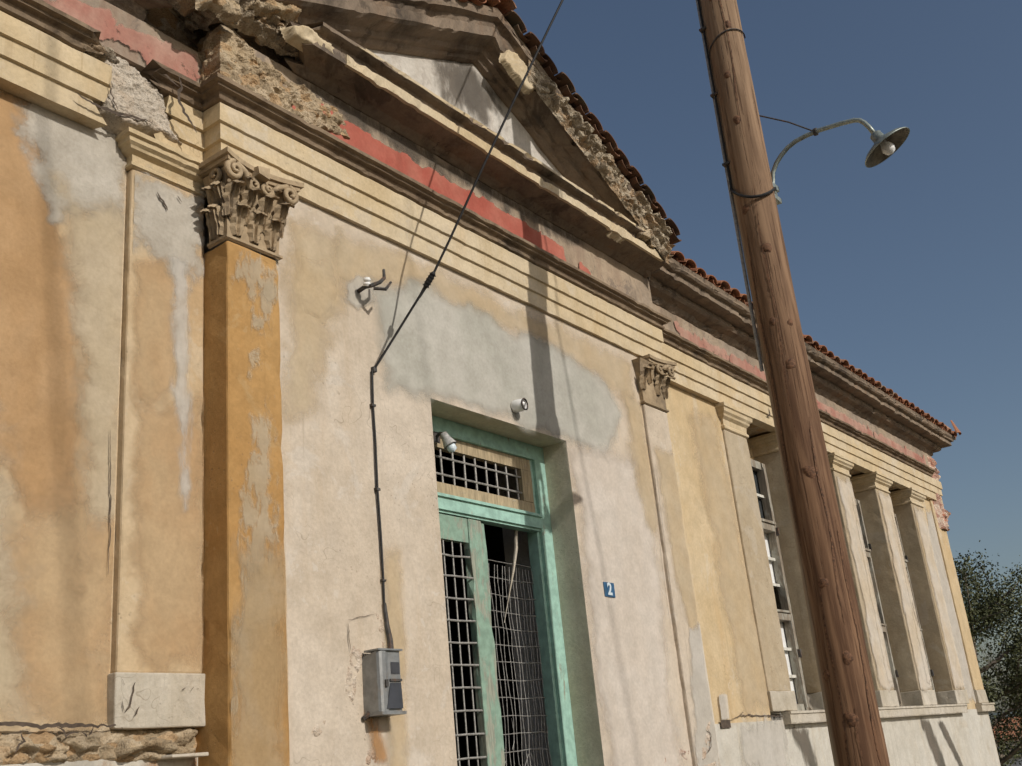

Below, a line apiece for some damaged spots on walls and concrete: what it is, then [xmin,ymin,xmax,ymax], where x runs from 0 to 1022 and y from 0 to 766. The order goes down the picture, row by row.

spalling [44,0,566,261]
spalling [499,50,676,265]
crack [106,435,114,572]
peeling [240,418,279,597]
crack [0,681,139,753]
spalling [0,723,209,765]
spalling [345,646,365,705]
spalling [702,694,731,766]